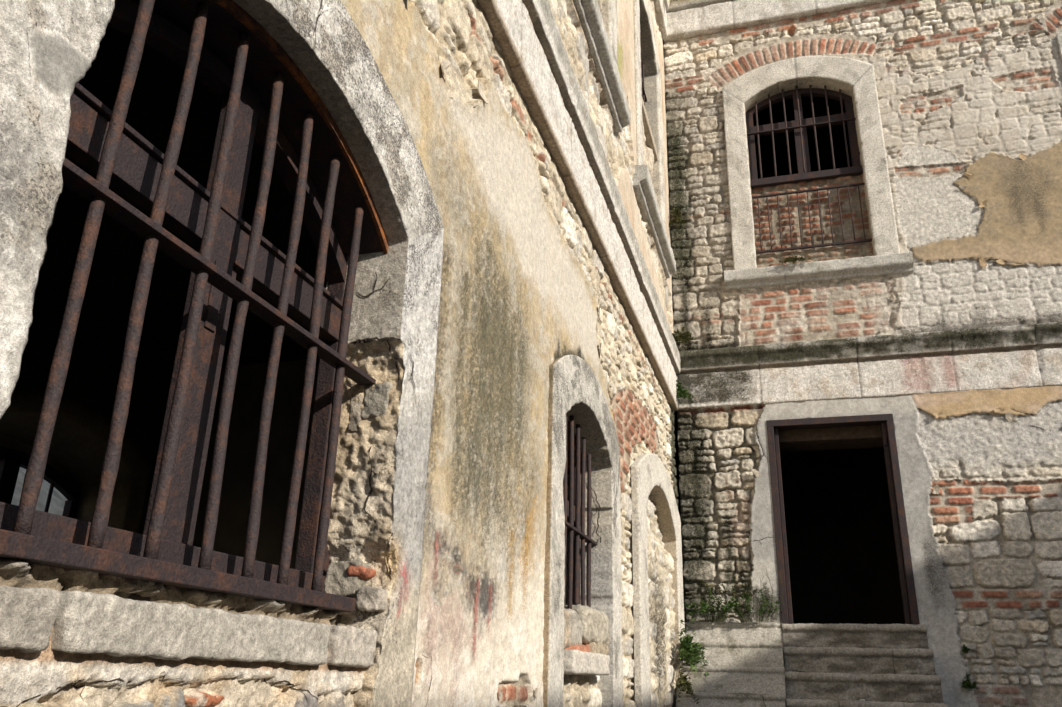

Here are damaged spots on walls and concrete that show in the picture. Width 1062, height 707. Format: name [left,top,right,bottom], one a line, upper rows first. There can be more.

crack [16,671,179,707]
crack [264,679,321,704]
spalling [324,339,405,707]
crack [364,446,381,529]
leakage [426,217,537,684]
flaking render [409,0,766,707]
leakage [681,281,690,345]
flaking render [548,0,1062,351]
flaking render [910,386,1062,707]